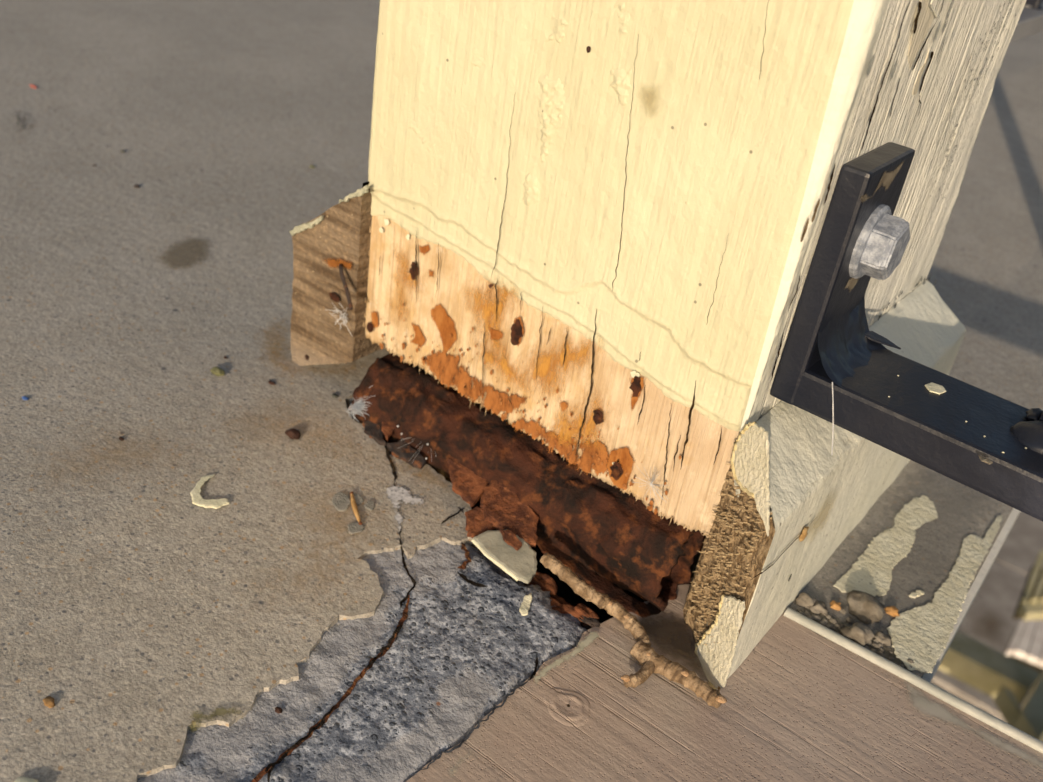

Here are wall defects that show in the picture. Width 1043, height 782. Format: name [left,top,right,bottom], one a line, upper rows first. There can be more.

peeling [908,0,940,95]
leakage [161,239,208,267]
crack [482,92,568,389]
spalling [137,530,587,782]
crack [384,440,416,608]
spalling [386,486,425,530]
corrosion [362,245,644,490]
corrosion [448,458,661,618]
crack [575,310,597,460]
crack [661,381,696,503]
peeling [833,495,938,596]
peeling [887,515,1002,673]